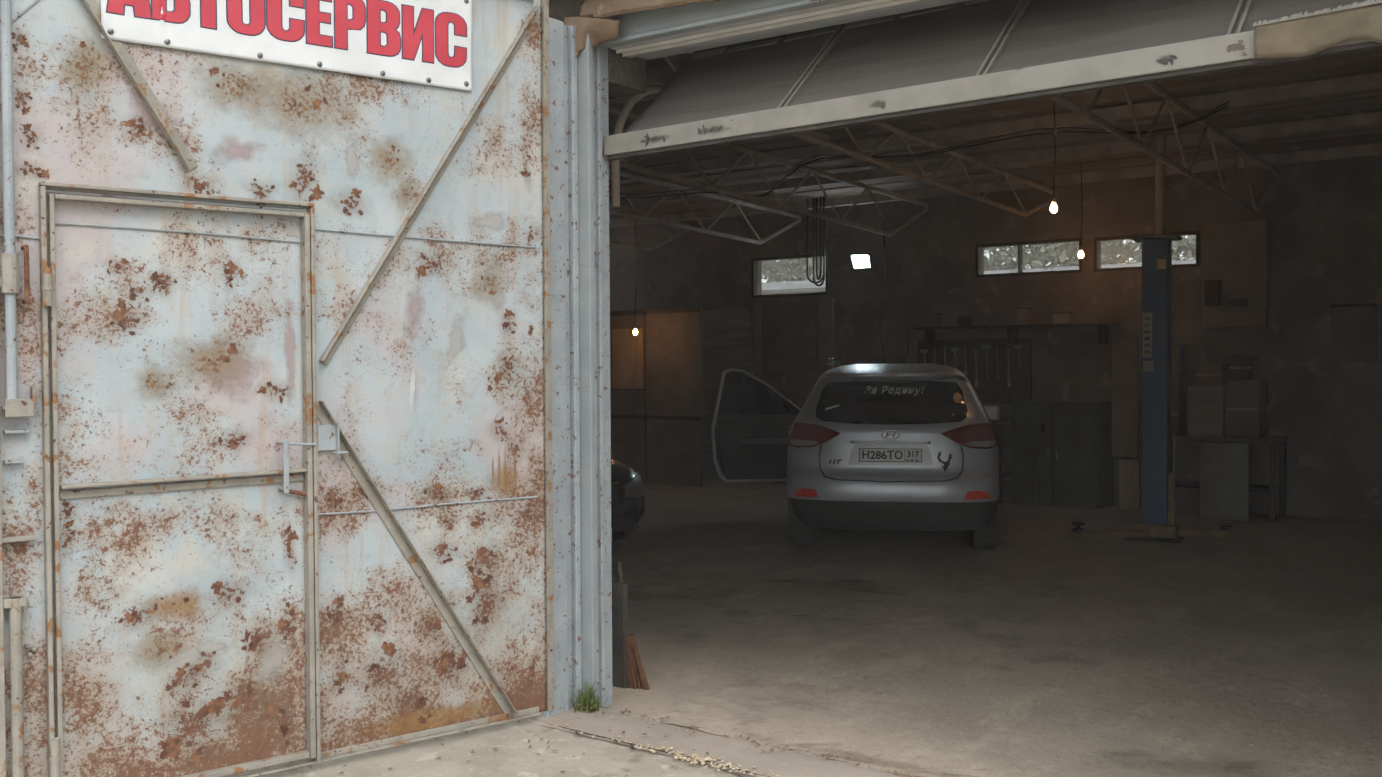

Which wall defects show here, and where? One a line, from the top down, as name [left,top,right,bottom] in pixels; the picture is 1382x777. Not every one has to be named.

corrosion [154,596,195,614]
corrosion [389,708,477,734]